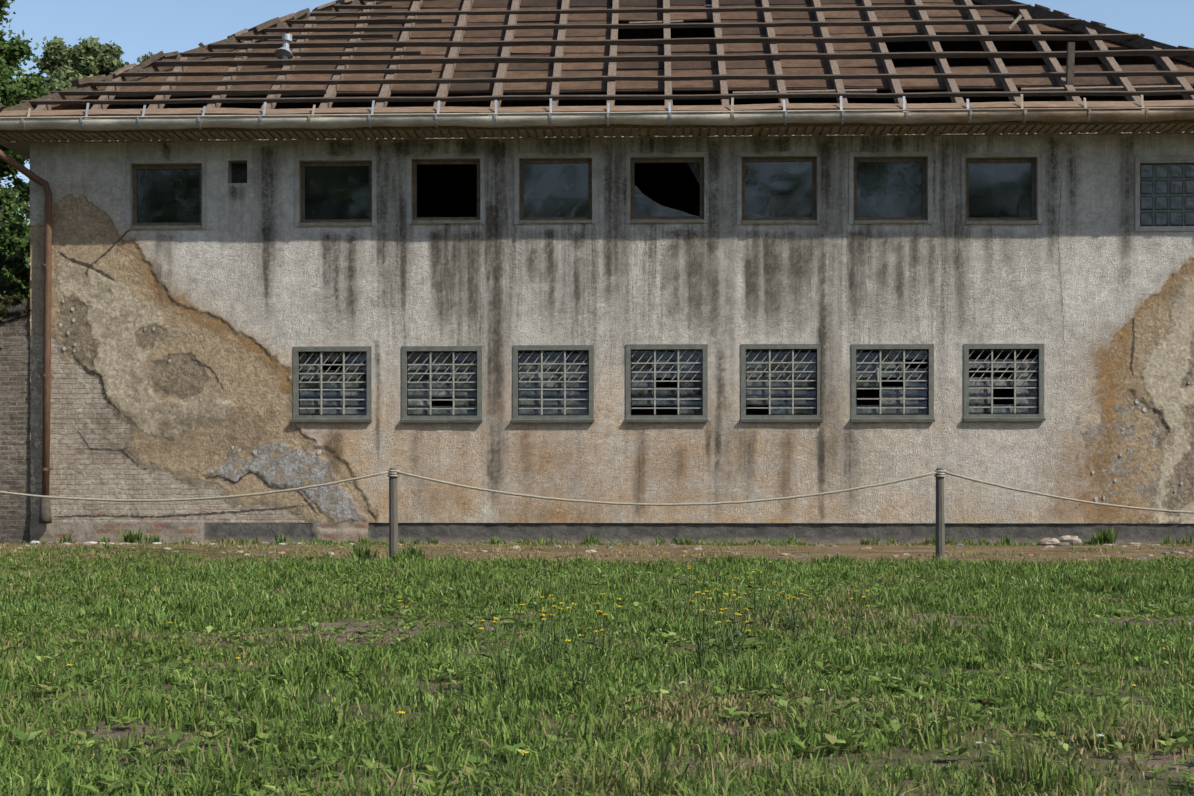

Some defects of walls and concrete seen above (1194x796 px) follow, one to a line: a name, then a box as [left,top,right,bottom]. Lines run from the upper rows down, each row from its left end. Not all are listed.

crack [60,230,130,283]
crack [73,355,121,413]
crack [77,430,153,470]
flaking render [0,194,379,523]
damp [139,259,293,393]
damp [324,237,355,313]
damp [431,181,504,412]
damp [527,231,554,305]
damp [707,352,729,466]
damp [746,144,853,511]
damp [1055,324,1134,517]
flaking render [1076,258,1194,524]